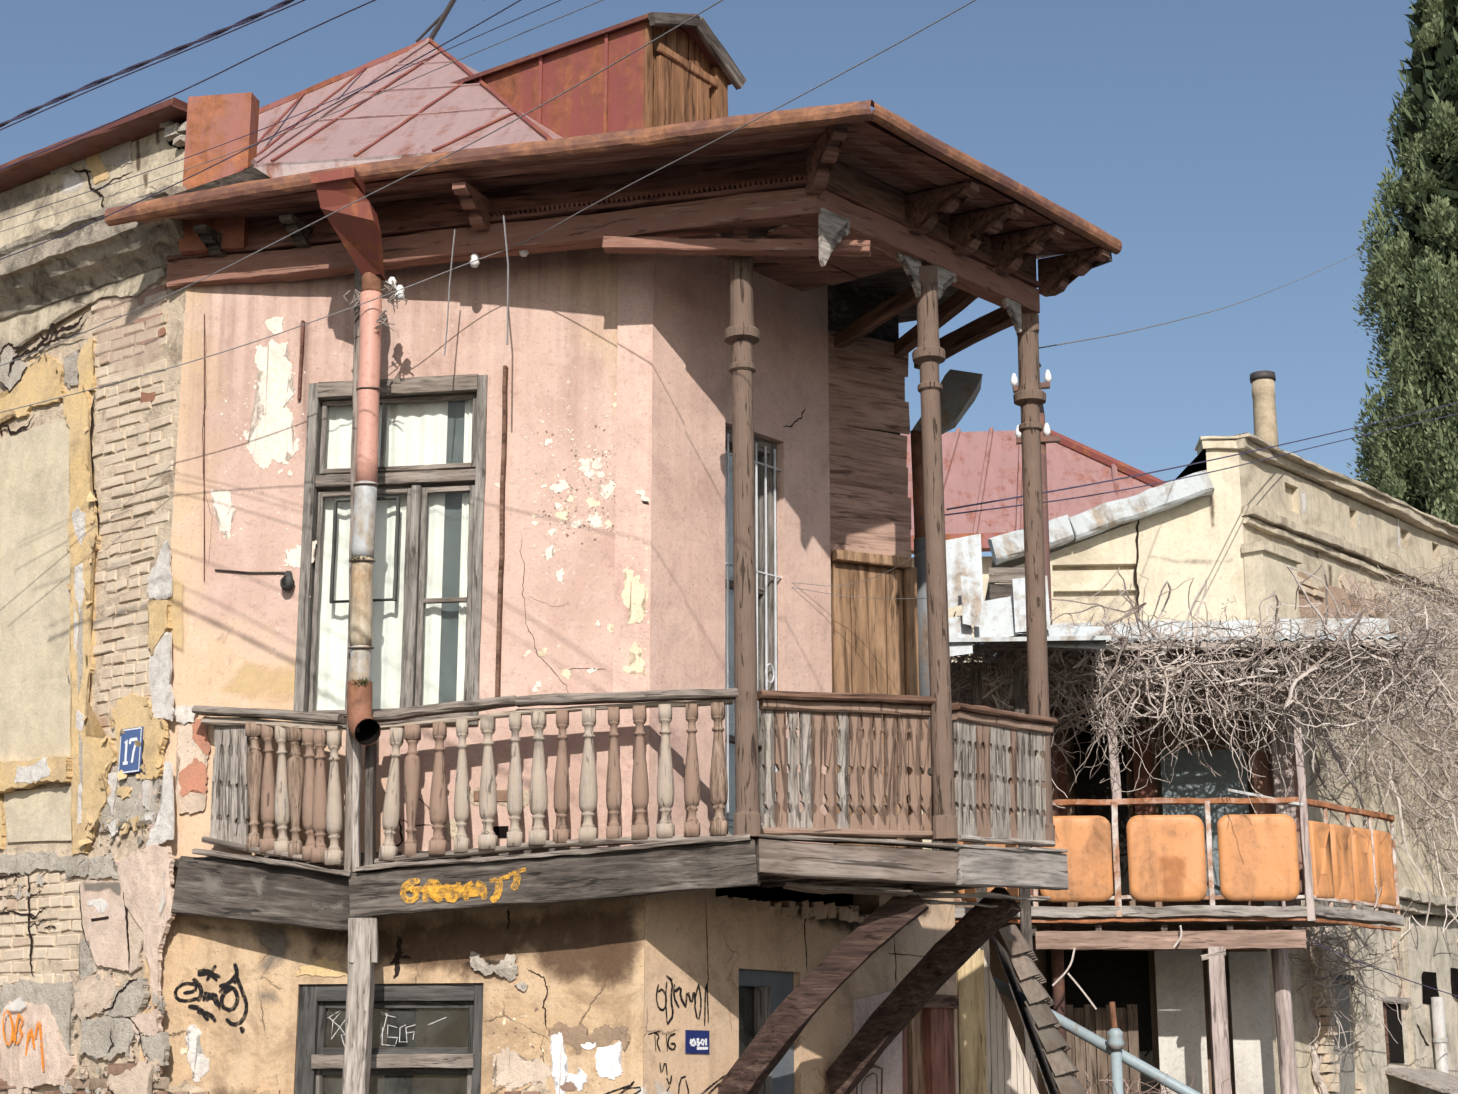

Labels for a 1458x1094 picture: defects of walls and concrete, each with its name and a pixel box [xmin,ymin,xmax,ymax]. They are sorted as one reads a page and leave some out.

crack [72,168,132,208]
crack [0,312,99,537]
peeling [211,317,317,601]
flaking render [0,271,211,1094]
crack [520,533,600,692]
peeling [521,392,650,689]
peeling [203,875,222,894]
peeling [252,877,264,894]
peeling [489,1007,631,1094]